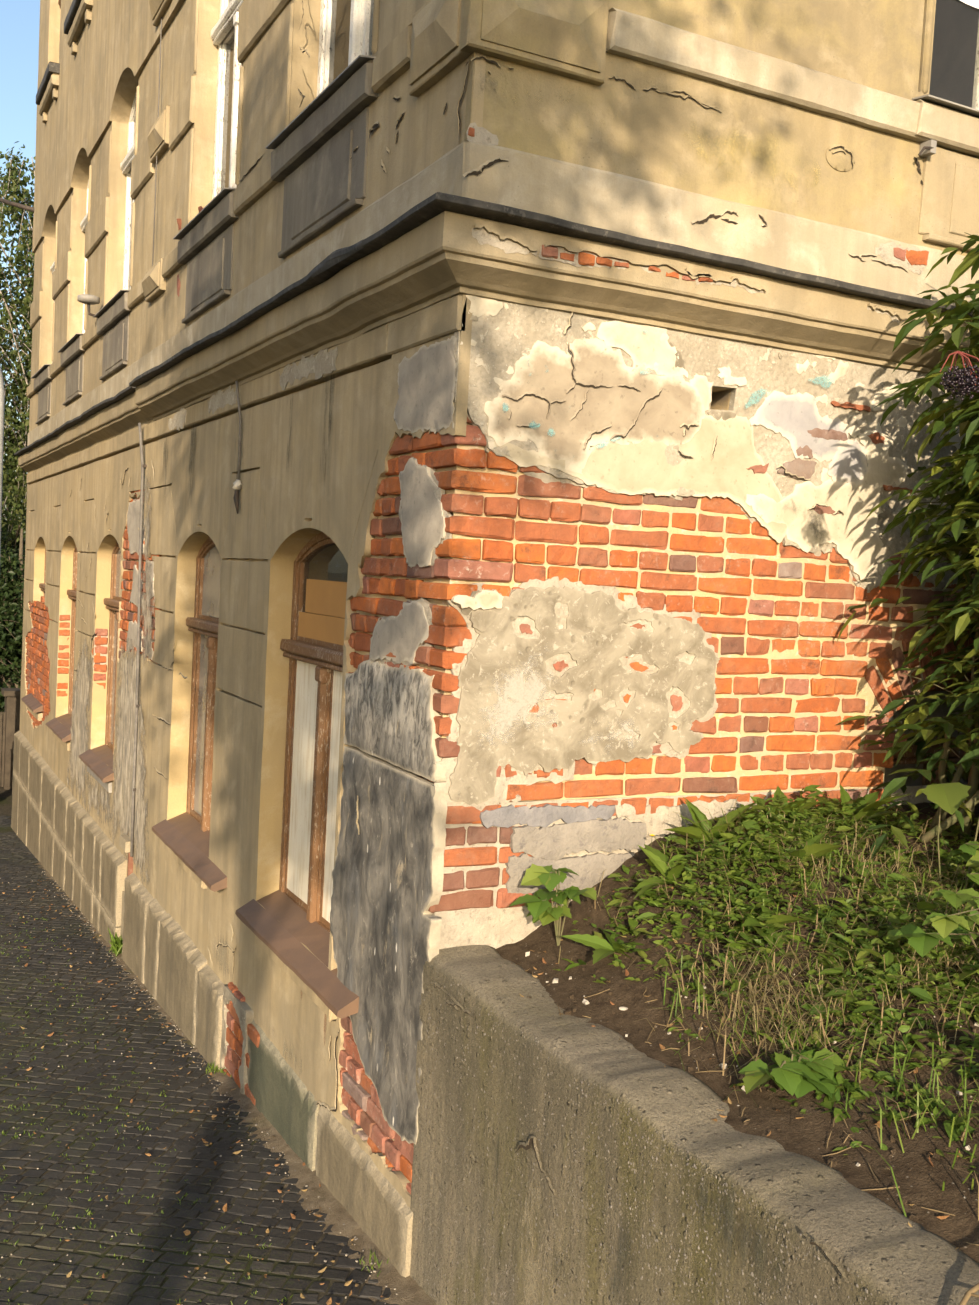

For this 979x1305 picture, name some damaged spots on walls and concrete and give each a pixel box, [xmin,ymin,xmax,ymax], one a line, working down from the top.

crack [350,95,405,173]
crack [443,55,514,177]
crack [609,75,722,113]
flaking render [472,223,766,294]
flaking render [875,242,929,275]
flaking render [168,408,187,432]
flaking render [279,347,338,391]
crack [502,312,662,450]
crack [678,423,718,460]
flaking render [26,478,162,882]
flaking render [330,295,979,1194]
flaking render [220,982,260,1105]